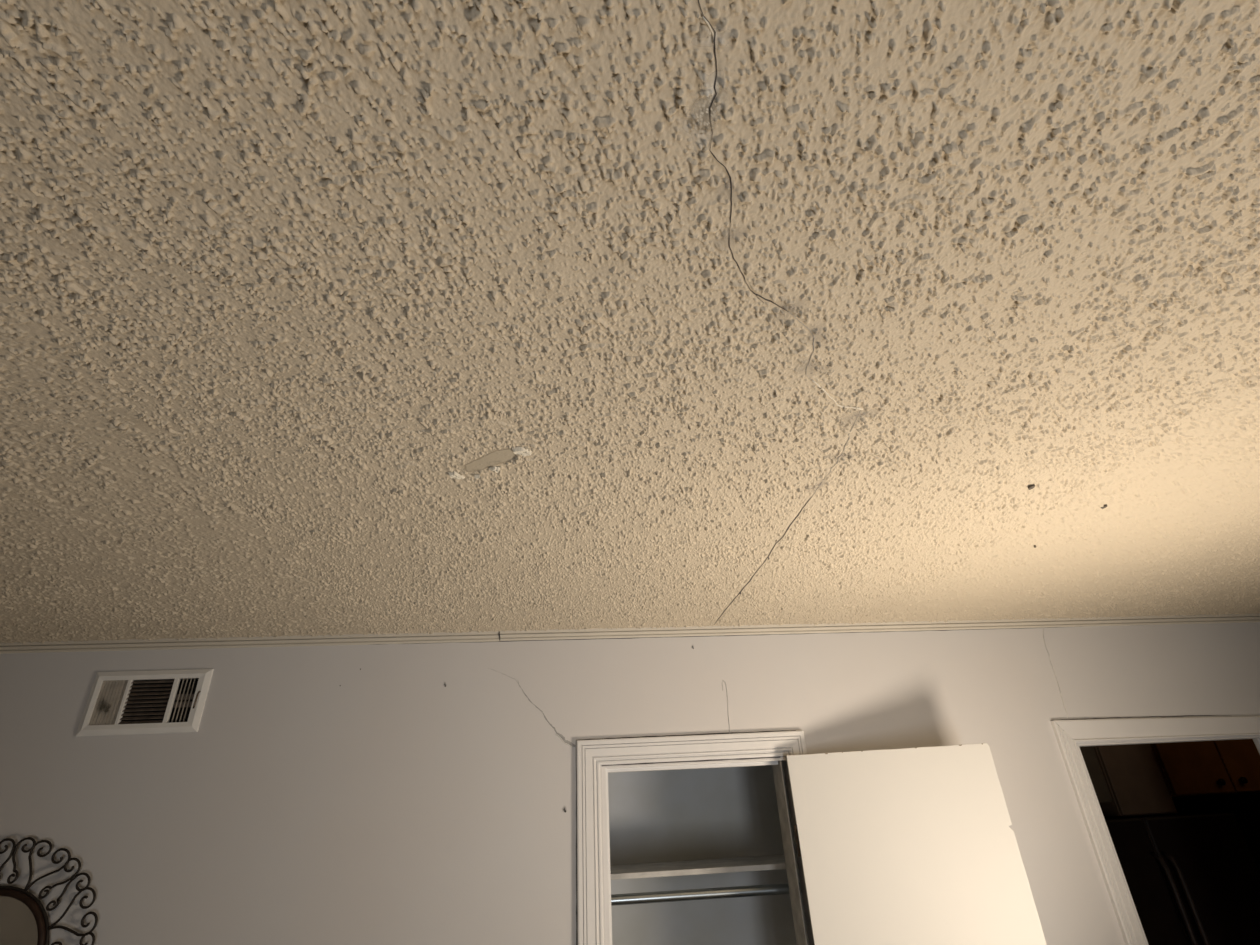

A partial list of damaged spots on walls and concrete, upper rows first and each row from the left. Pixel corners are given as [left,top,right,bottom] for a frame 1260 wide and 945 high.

crack [686,0,863,622]
crack [492,633,576,748]